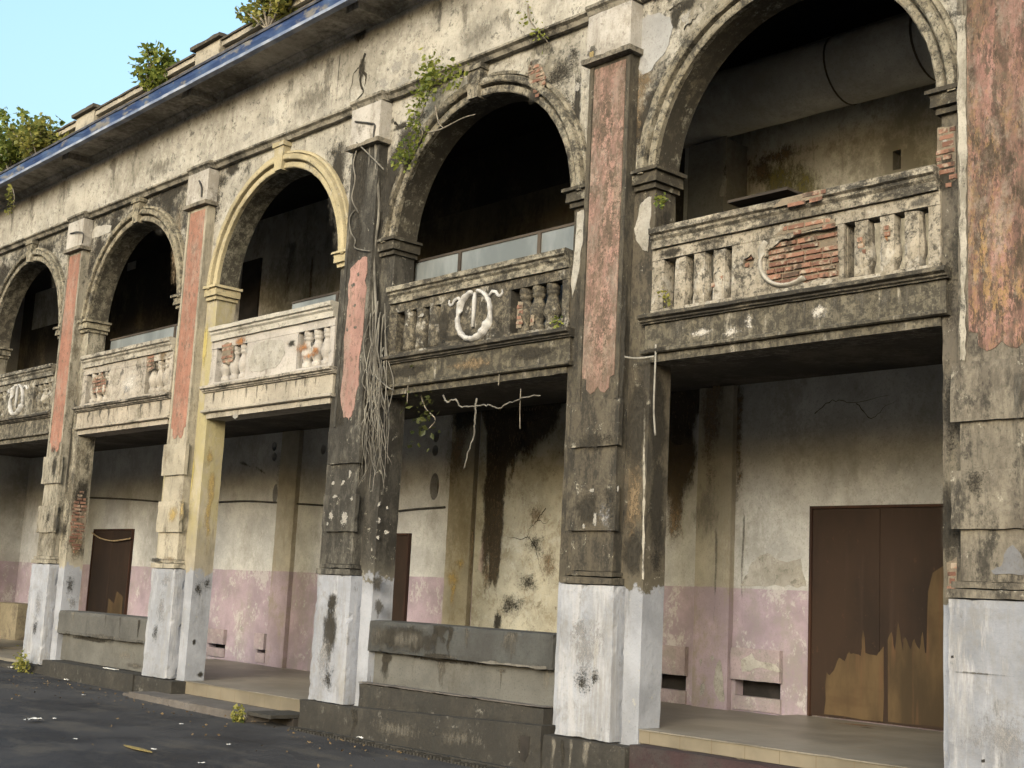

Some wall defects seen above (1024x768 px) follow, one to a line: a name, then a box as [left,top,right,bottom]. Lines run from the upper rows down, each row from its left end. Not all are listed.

flaking render [528,59,546,101]
peeling [634,197,652,252]
flaking render [773,189,826,208]
flaking render [766,218,866,283]
peeling [936,15,968,361]
water stain [577,286,723,590]
flaking render [69,482,88,554]
water stain [447,402,565,590]
crack [512,508,549,572]